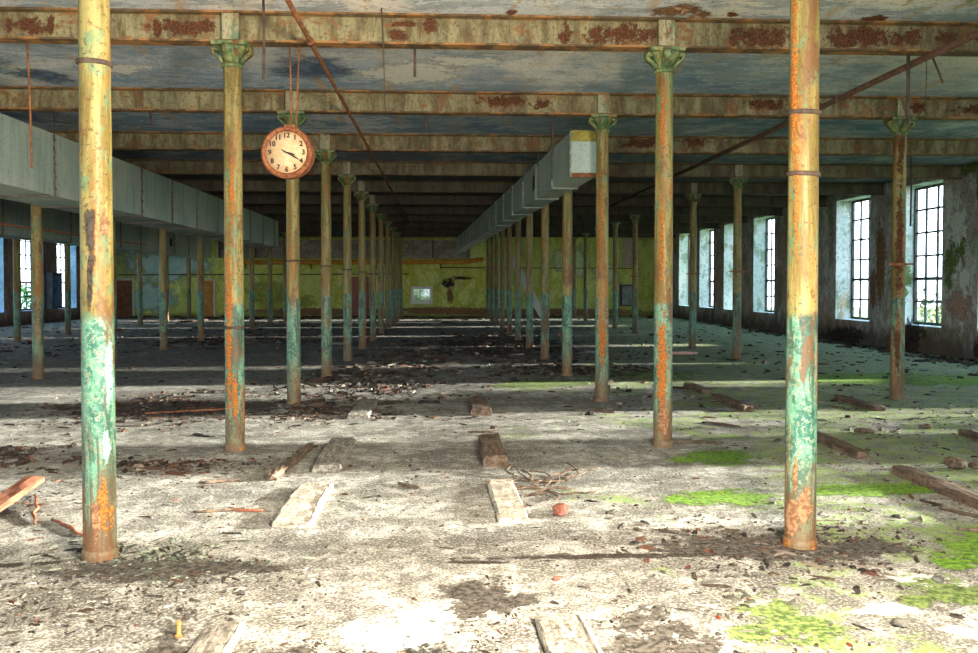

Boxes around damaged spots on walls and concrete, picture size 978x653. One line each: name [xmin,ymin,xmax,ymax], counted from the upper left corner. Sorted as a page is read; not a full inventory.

peeling [647,3,711,21]
corrosion [6,15,55,36]
corrosion [144,16,222,39]
corrosion [557,20,657,45]
corrosion [823,14,959,49]
damp [11,69,75,84]
damp [273,57,353,77]
corrosion [475,94,551,110]
peeling [944,182,973,321]
corrosion [225,140,239,430]
peeling [104,340,115,410]
peeling [102,430,111,467]